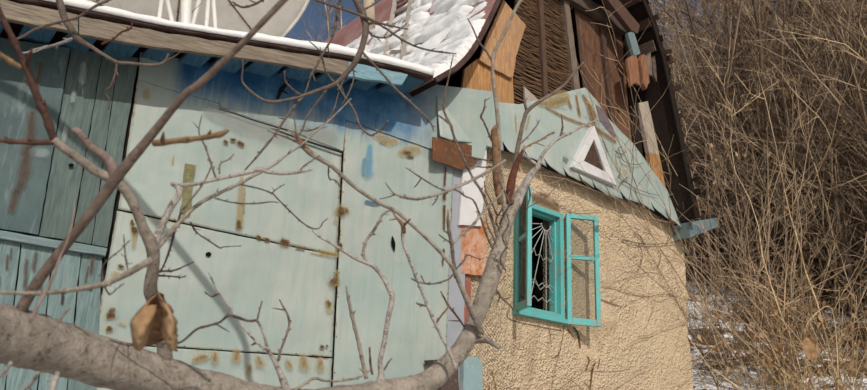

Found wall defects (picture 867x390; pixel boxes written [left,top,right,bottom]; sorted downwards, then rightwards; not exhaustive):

corrosion [286,355,323,370]